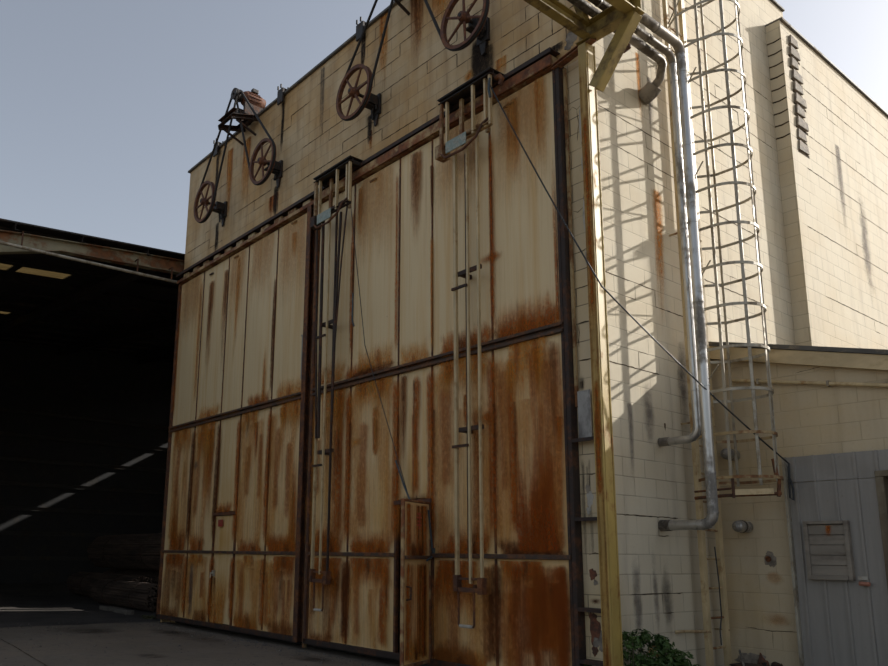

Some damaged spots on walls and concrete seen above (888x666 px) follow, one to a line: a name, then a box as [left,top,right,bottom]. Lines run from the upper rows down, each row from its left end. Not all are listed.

corrosion [169,281,301,630]
corrosion [309,140,564,666]
corrosion [654,191,663,277]
spalling [589,612,603,656]